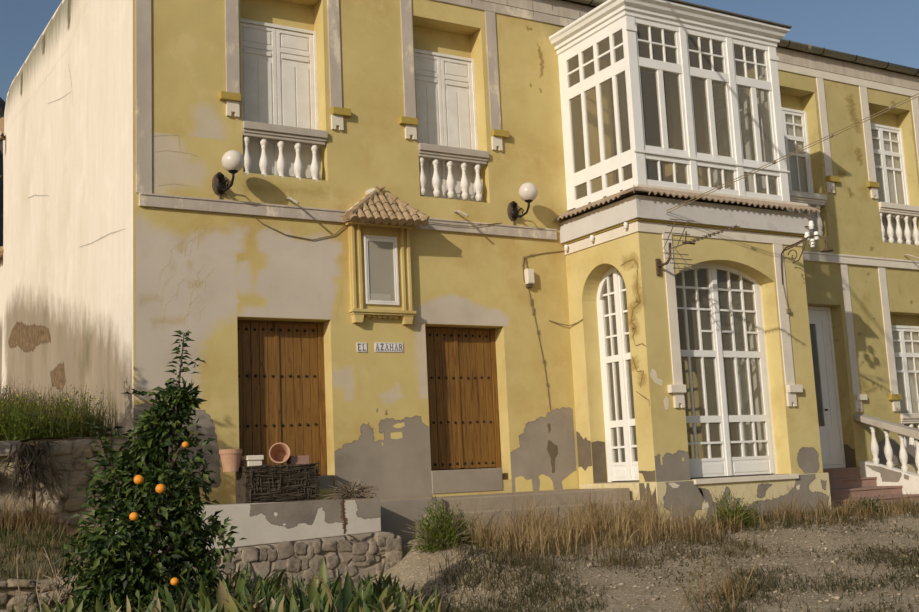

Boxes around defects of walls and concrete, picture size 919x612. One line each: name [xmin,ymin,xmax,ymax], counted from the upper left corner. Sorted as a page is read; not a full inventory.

crack [81,229,124,247]
flaking render [8,322,51,353]
flaking render [50,363,66,391]
water stain [0,269,132,443]
peeling [250,289,514,529]
peeling [510,403,578,492]
peeling [654,444,829,523]